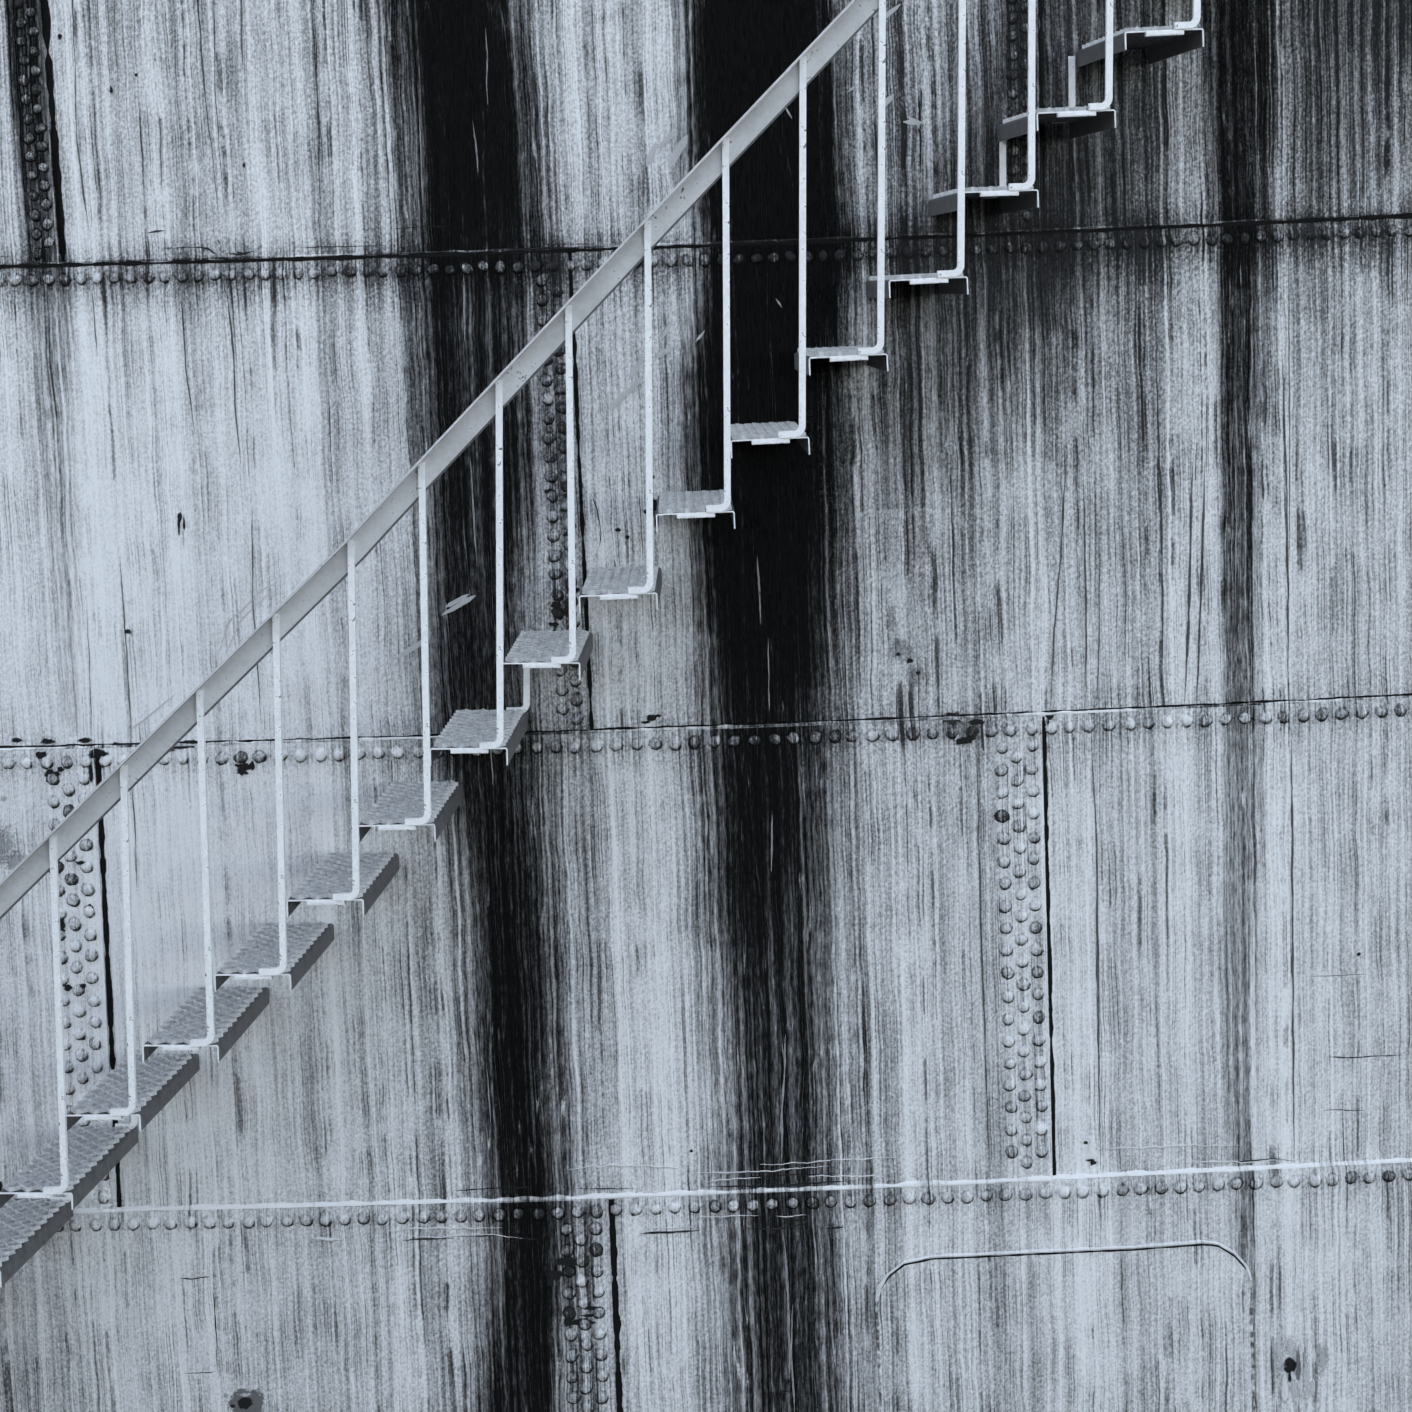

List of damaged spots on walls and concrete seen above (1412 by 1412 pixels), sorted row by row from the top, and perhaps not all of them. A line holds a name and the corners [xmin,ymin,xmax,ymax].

leakage [365,0,554,464]
leakage [413,365,588,1412]
leakage [667,0,1169,1412]